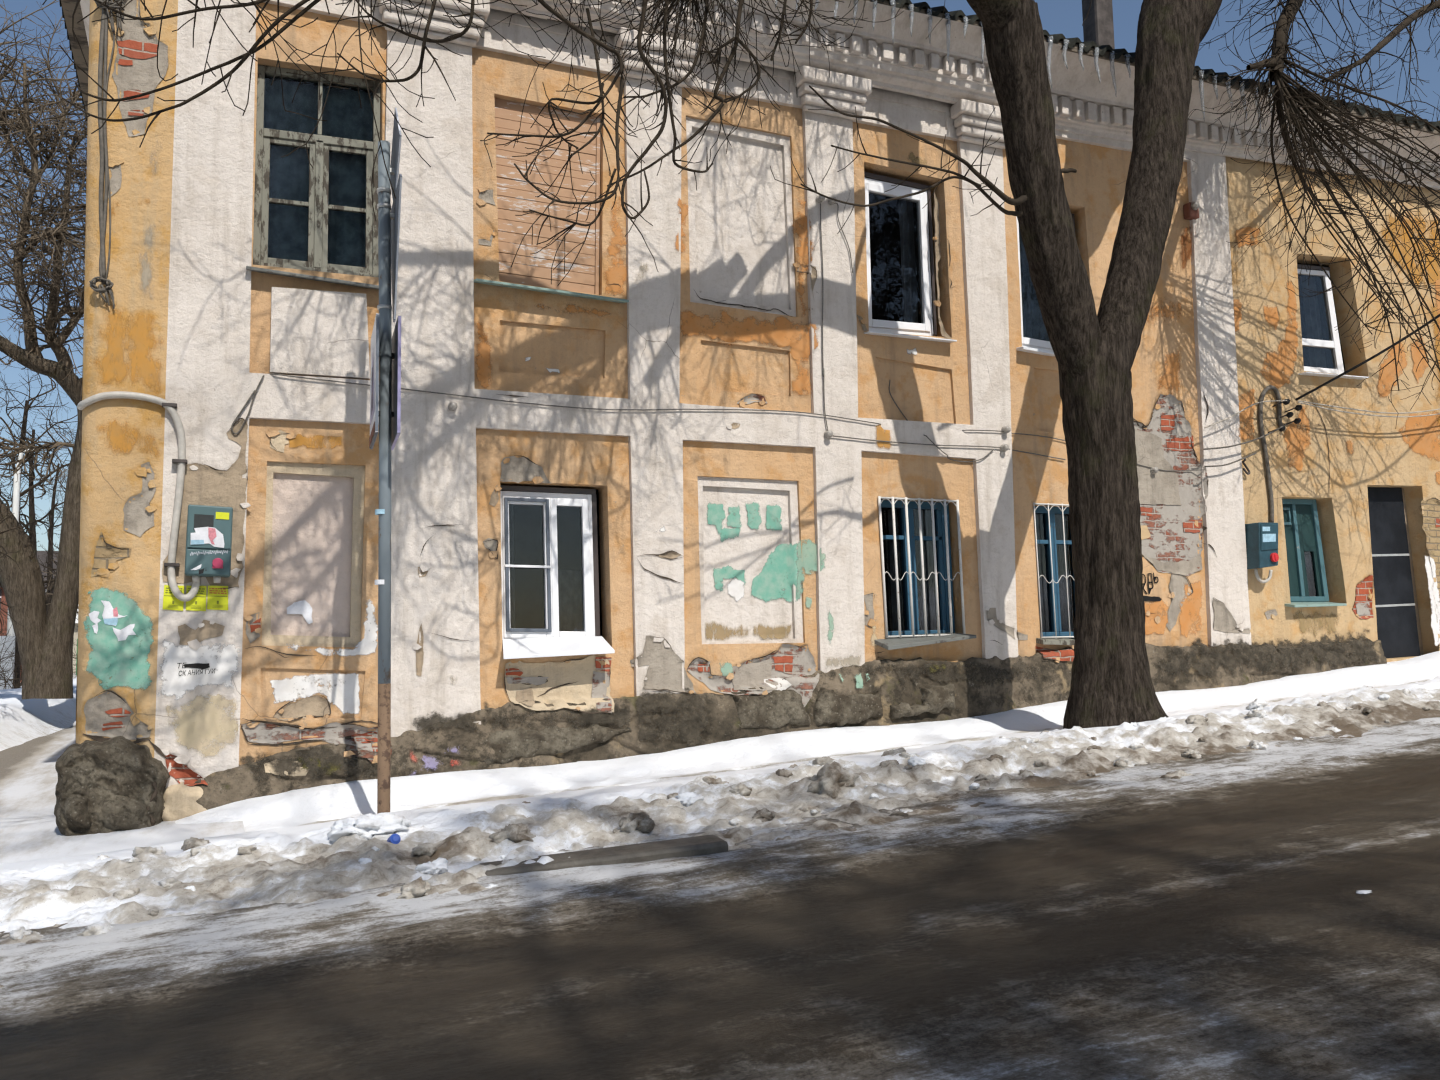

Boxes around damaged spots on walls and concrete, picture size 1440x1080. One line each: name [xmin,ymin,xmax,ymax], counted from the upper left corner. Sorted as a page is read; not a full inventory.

spalling [112,0,168,137]
peeling [91,462,161,577]
peeling [489,455,551,507]
spalling [1133,394,1209,631]
peeling [1213,597,1250,634]
spalling [1352,574,1374,619]
spalling [1419,498,1440,651]
spalling [84,690,153,740]
spalling [163,750,208,786]
spalling [241,695,392,776]
spalling [504,655,614,714]
spalling [630,634,819,707]